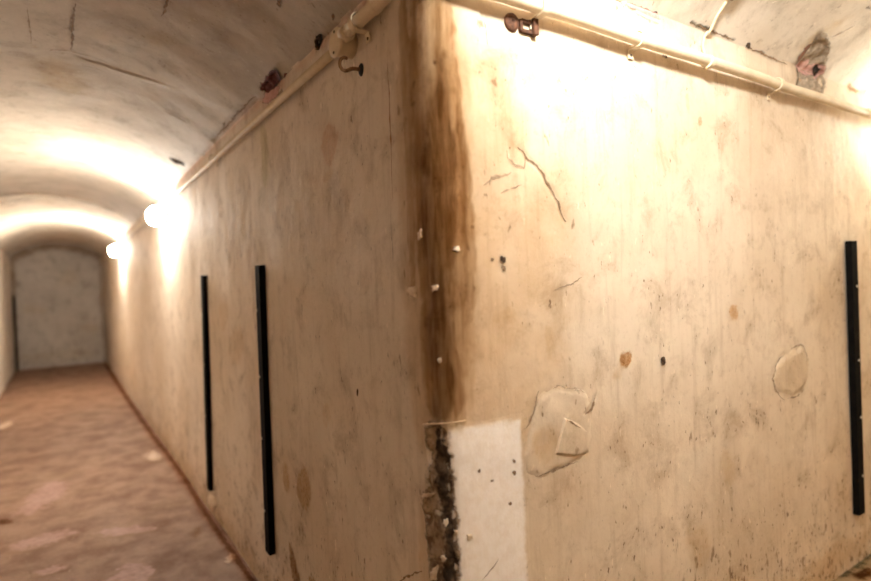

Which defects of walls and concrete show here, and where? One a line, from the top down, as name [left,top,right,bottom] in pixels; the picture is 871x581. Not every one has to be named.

flaking render [260,70,287,104]
flaking render [795,33,831,93]
crack [489,147,566,222]
flaking render [422,425,473,581]